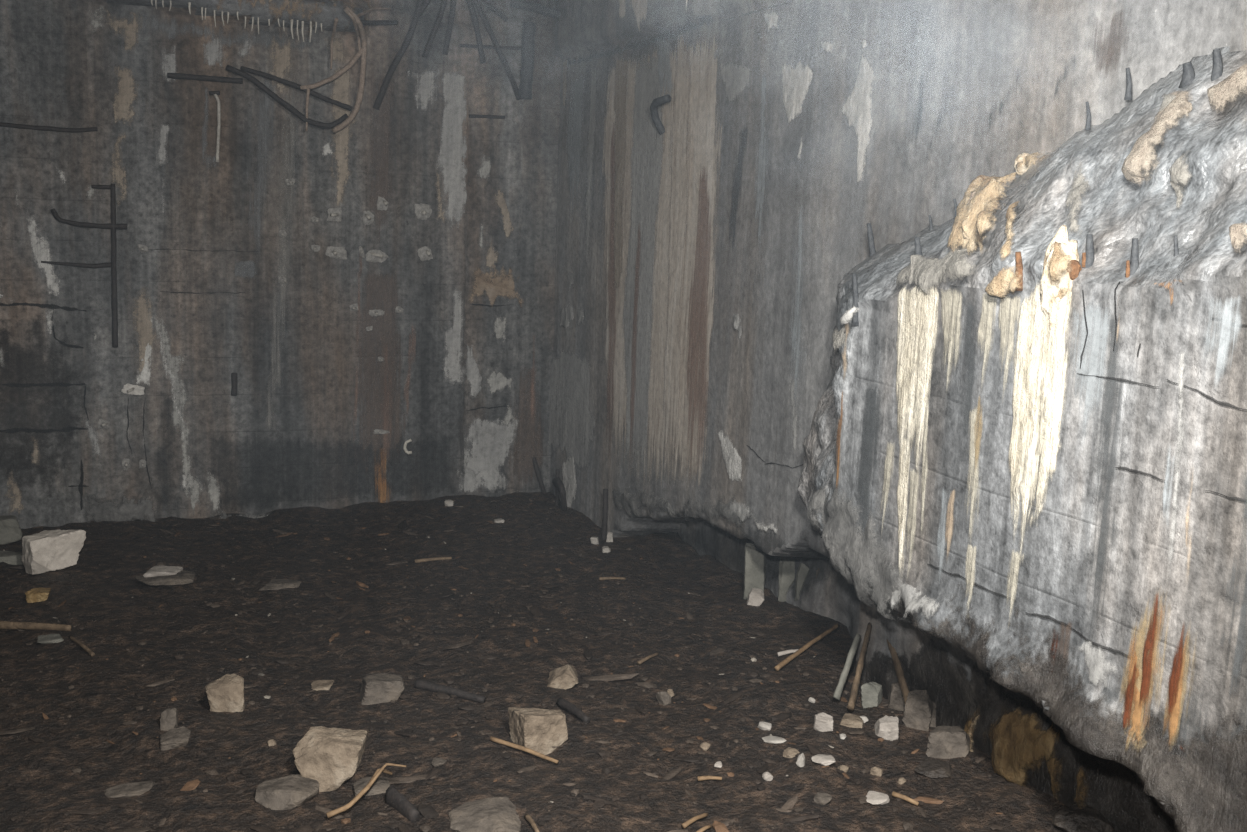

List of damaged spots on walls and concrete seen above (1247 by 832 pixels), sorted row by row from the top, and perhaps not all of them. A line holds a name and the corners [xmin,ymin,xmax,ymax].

peeling [407,70,505,222]
peeling [444,226,522,397]
peeling [459,405,518,492]
leakage [562,0,768,485]
leakage [859,388,928,572]
leakage [941,290,1020,460]
leakage [1076,306,1122,584]
crack [1115,467,1165,481]
crack [1077,281,1247,410]
crack [927,564,1131,658]
corrosion [1123,595,1161,741]
corrosion [1167,629,1187,736]